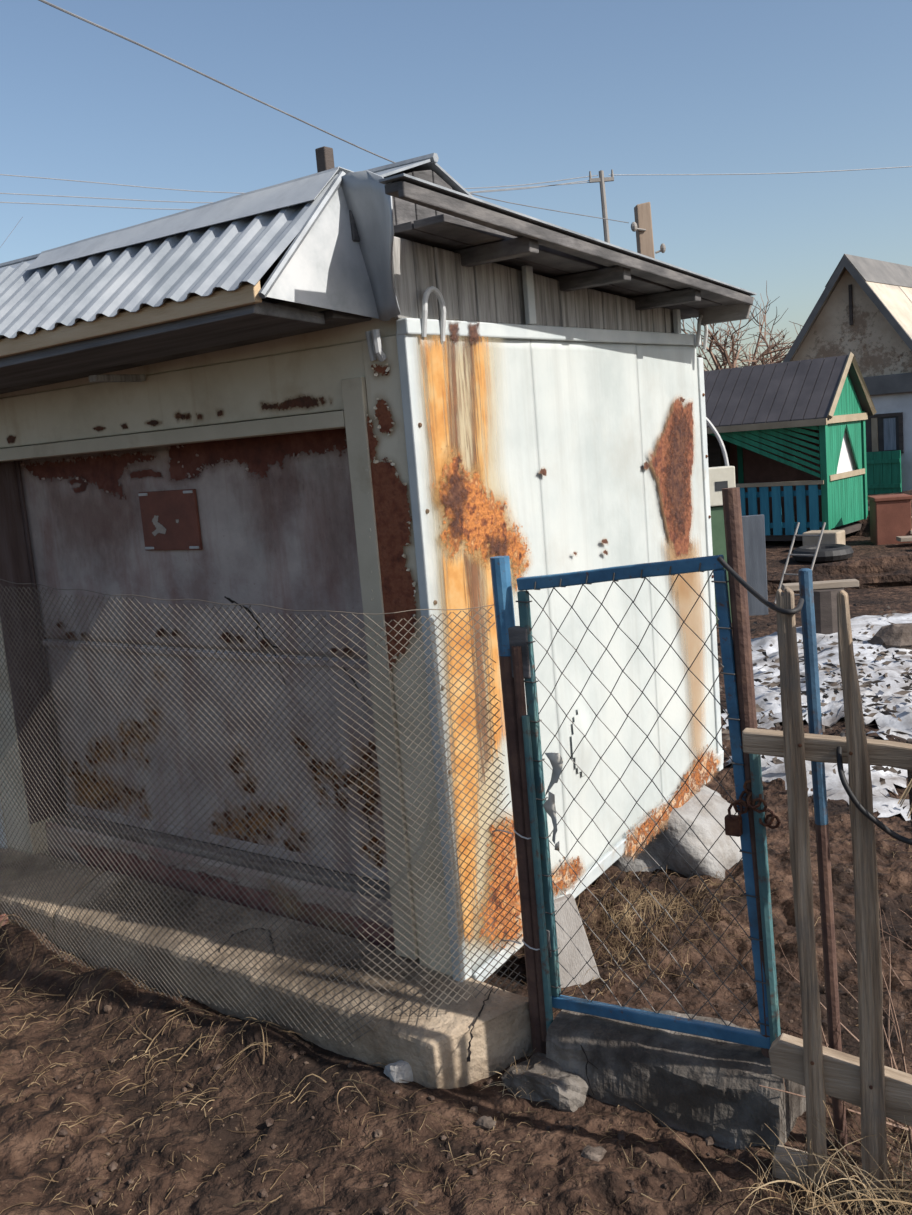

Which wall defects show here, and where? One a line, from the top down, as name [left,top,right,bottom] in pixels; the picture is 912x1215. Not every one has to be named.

peeling [20,428,347,500]
rust [432,446,531,591]
rust [644,397,694,558]
rust [61,701,160,819]
rust [211,750,306,852]
rust [295,737,379,815]
rust [361,836,386,868]
rust [475,815,523,954]
rust [551,856,584,898]
rust [622,745,720,860]
crack [467,981,498,1062]